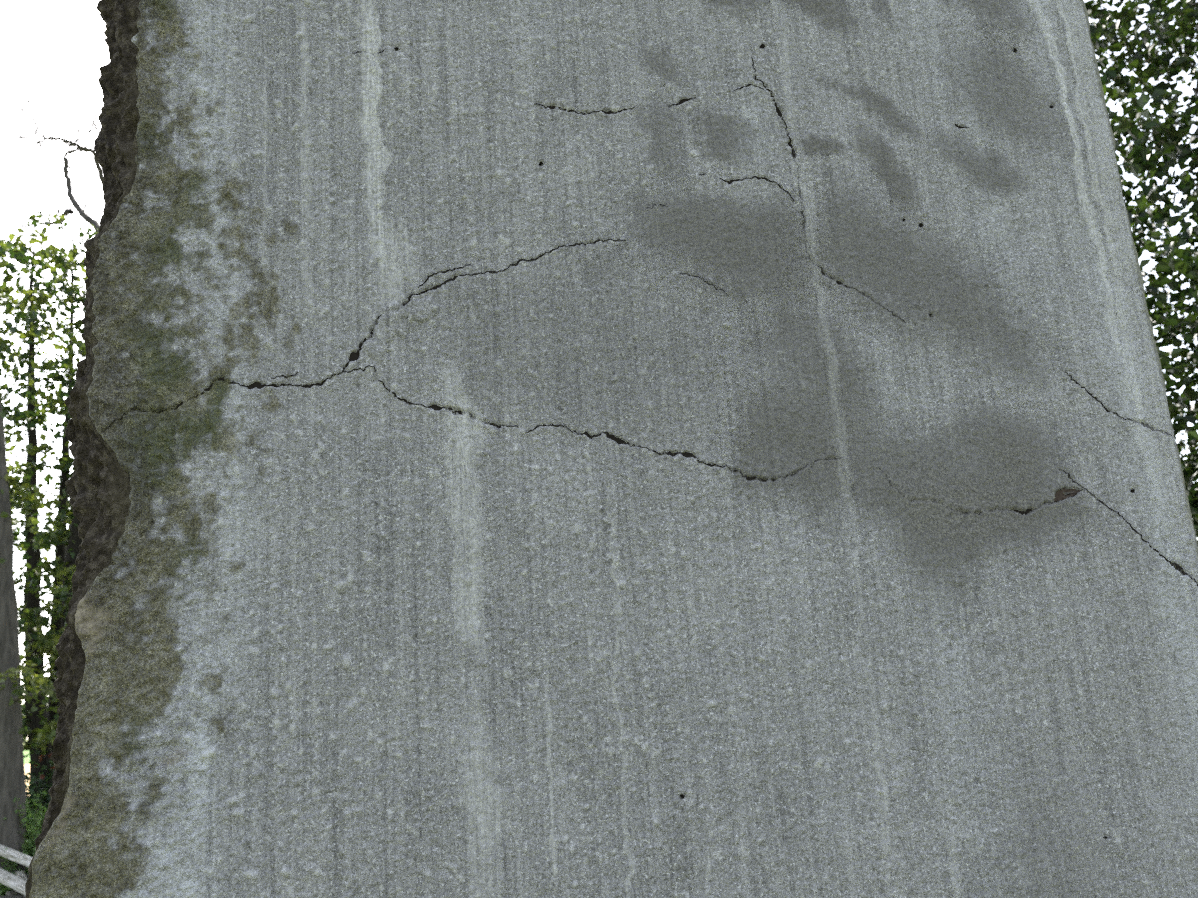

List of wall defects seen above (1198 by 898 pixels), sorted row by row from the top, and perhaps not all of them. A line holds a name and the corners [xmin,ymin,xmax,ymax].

crack [535,103,635,115]
crack [699,56,906,323]
spalling [25,0,141,898]
crack [101,239,842,482]
crack [942,469,1198,586]
crack [1066,372,1177,446]